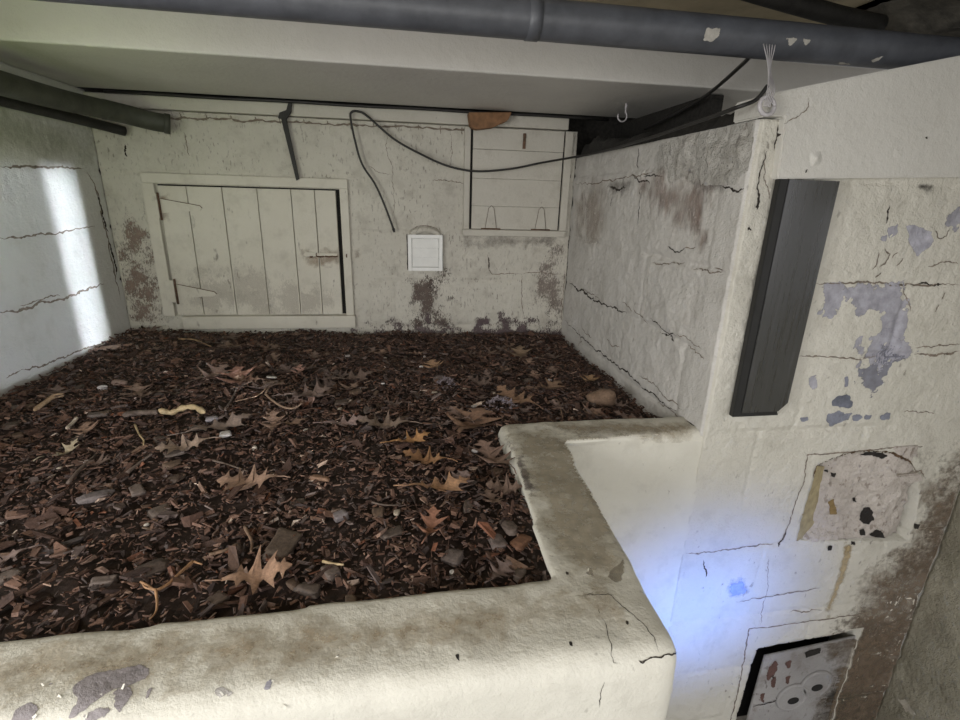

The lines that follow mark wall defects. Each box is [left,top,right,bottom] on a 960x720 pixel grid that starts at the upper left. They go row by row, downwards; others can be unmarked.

peeling [703,28,720,42]
crack [570,149,662,225]
crack [722,102,809,230]
crack [1,165,120,313]
water stain [115,218,165,323]
water stain [350,243,565,337]
crack [488,257,704,426]
peeling [817,280,918,427]
crack [566,571,676,664]
peeling [69,665,152,720]
water stain [828,620,912,720]